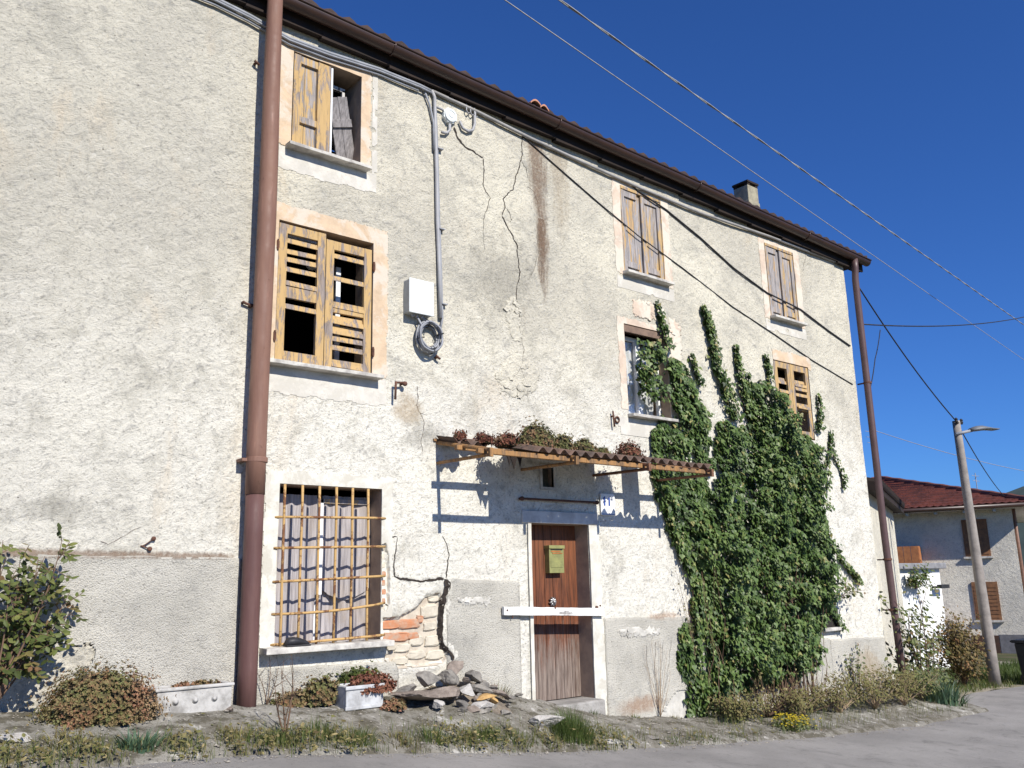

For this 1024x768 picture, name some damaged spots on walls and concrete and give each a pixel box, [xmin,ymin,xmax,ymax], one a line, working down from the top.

crack [453,127,528,396]
damp [529,141,545,262]
spalling [380,548,448,669]
crack [392,536,458,660]